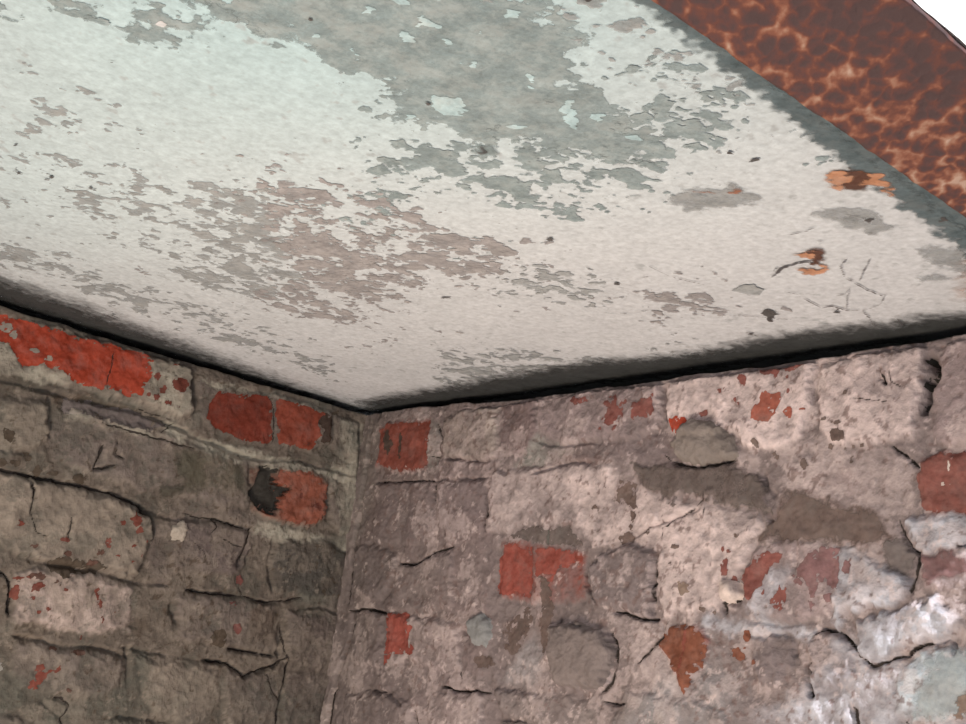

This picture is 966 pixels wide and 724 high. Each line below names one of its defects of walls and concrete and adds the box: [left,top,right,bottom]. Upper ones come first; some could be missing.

peeling [0,0,764,386]
corrosion [826,170,895,197]
corrosion [798,248,829,275]
peeling [0,314,189,432]
spalling [207,391,332,450]
peeling [750,364,805,422]
crack [0,409,192,538]
crack [0,572,10,615]
crack [349,571,387,628]
peeling [498,525,583,655]
crack [204,627,289,724]
crack [815,629,934,668]